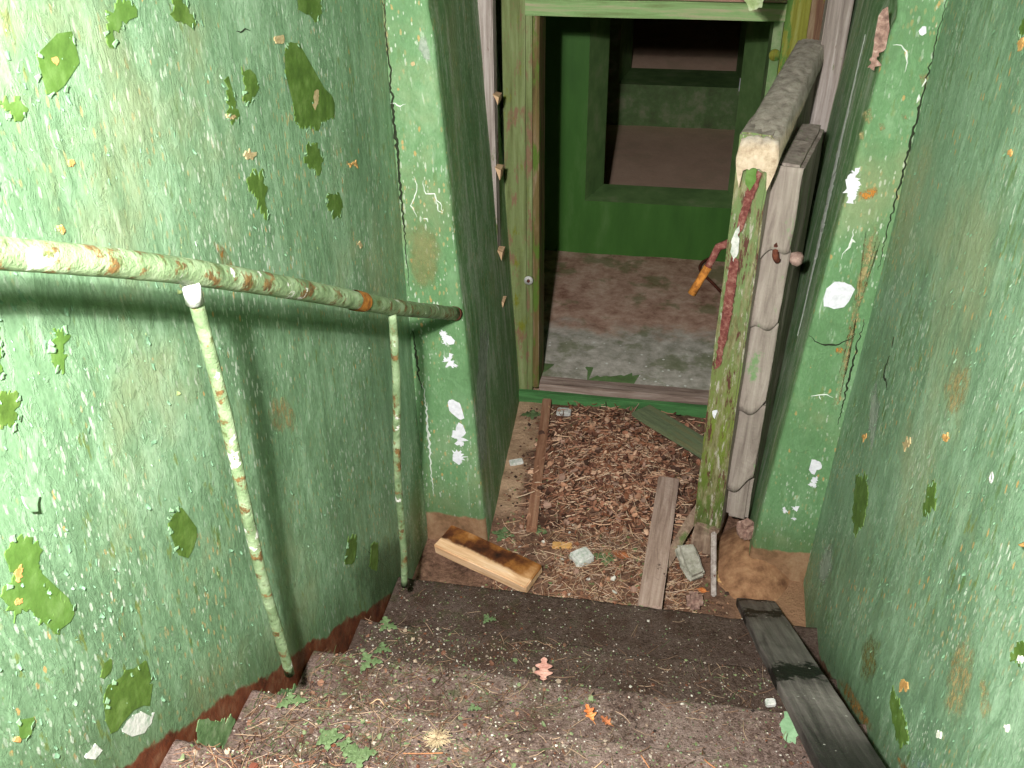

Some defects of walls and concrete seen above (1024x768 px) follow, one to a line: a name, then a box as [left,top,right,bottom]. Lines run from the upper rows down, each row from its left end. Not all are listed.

peeling [0,31,86,126]
peeling [274,35,349,176]
crack [382,3,443,286]
crack [878,0,947,267]
crack [797,34,866,425]
rust [349,290,373,312]
crack [883,337,894,389]
peeling [0,527,164,645]
peeling [877,667,911,751]